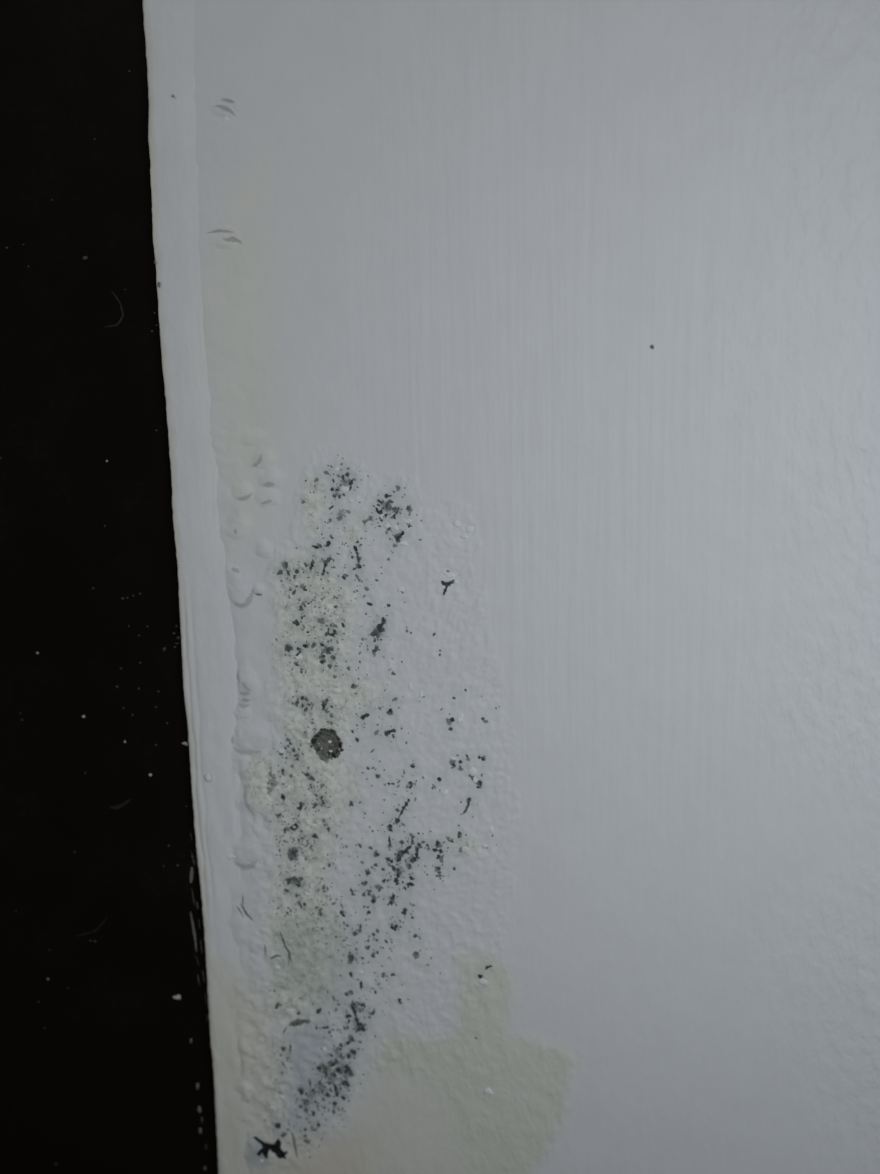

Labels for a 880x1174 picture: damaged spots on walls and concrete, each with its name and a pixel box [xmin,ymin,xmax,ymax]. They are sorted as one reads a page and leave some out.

damp [230,454,583,1174]